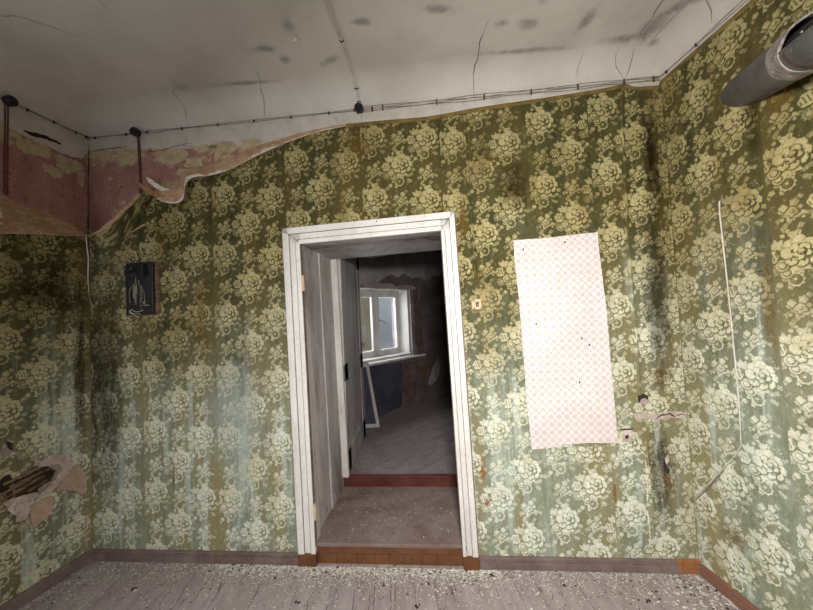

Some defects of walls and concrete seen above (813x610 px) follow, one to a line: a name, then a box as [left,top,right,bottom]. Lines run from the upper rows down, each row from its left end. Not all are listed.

crack [615,0,712,78]
peeling [0,132,85,188]
peeling [153,137,264,176]
peeling [634,411,687,420]
spalling [0,454,87,528]